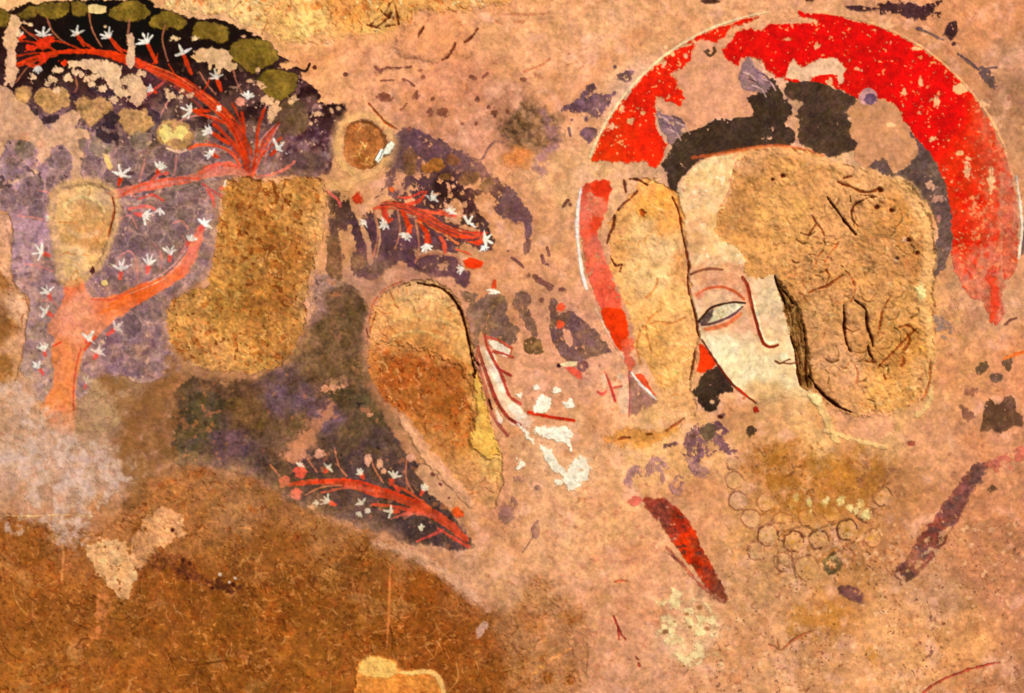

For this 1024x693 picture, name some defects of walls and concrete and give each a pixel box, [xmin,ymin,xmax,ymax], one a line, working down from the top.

flaking render [0,15,148,287]
peeling [159,124,189,154]
peeling [164,89,195,102]
peeling [247,67,300,124]
flaking render [166,106,397,375]
flaking render [367,280,504,510]
flaking render [604,178,701,449]
flaking render [714,98,937,450]
flaking render [0,466,599,693]